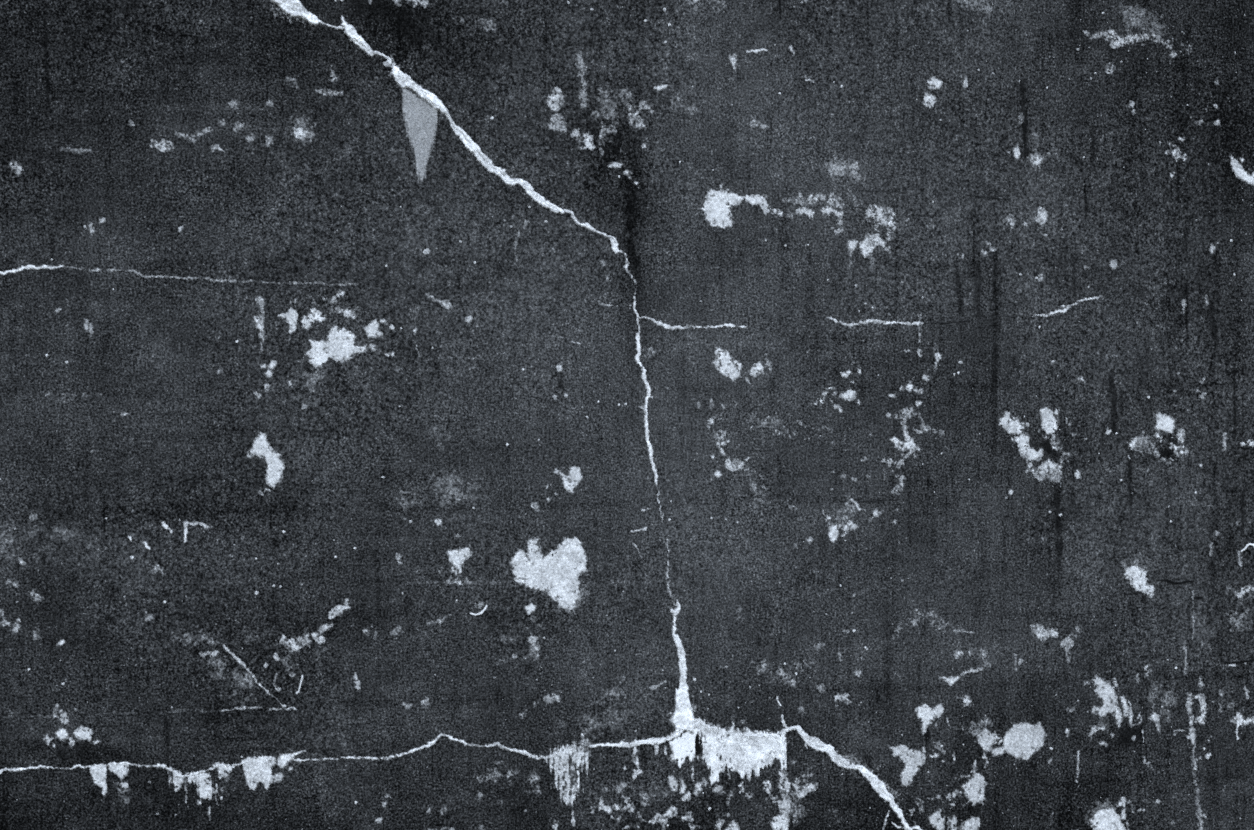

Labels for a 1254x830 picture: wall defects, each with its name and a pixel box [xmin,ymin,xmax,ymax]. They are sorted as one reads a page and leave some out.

crack [272,0,628,268]
spalling [702,185,896,257]
crack [0,265,62,275]
spalling [278,292,394,372]
crack [830,318,964,336]
spalling [247,433,285,495]
crack [609,302,746,532]
spalling [1000,407,1069,481]
spalling [511,537,587,611]
crack [0,550,694,823]
crack [777,697,921,830]
spalling [929,721,1045,830]